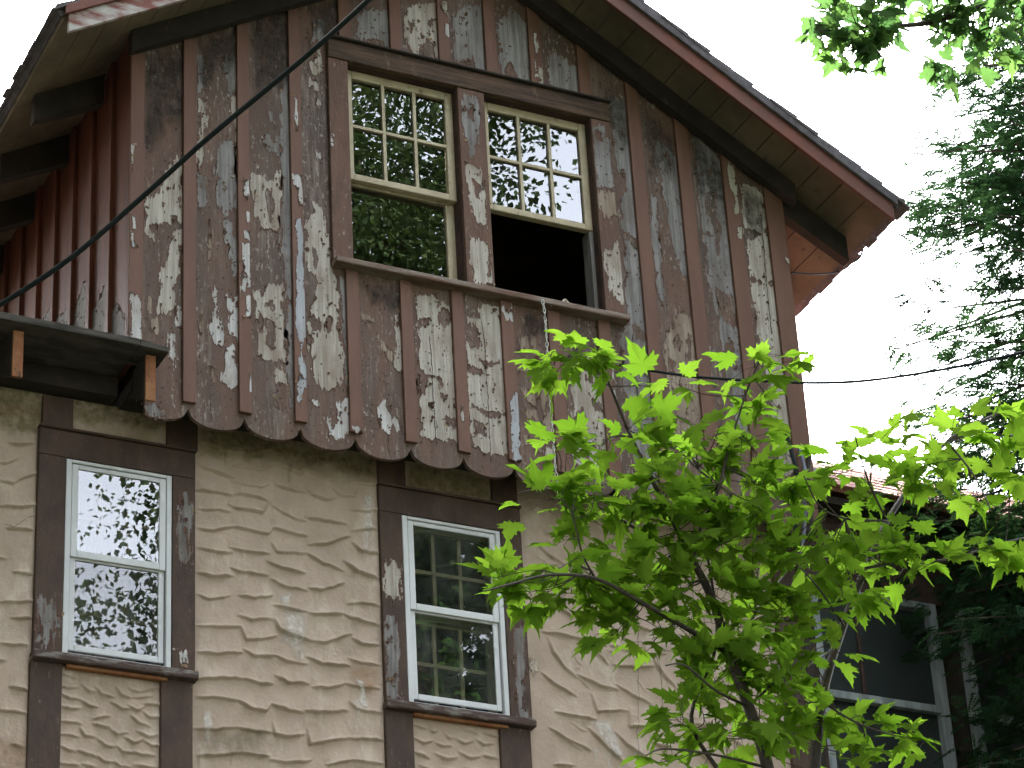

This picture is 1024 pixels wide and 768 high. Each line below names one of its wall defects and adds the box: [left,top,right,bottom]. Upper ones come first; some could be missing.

peeling [402,0,578,92]
peeling [38,152,183,373]
peeling [196,53,363,441]
peeling [459,88,495,287]
peeling [414,293,556,462]
peeling [566,97,663,495]
peeling [648,137,704,465]
peeling [689,131,794,477]
peeling [34,593,64,651]
peeling [174,486,196,569]
peeling [382,557,404,700]